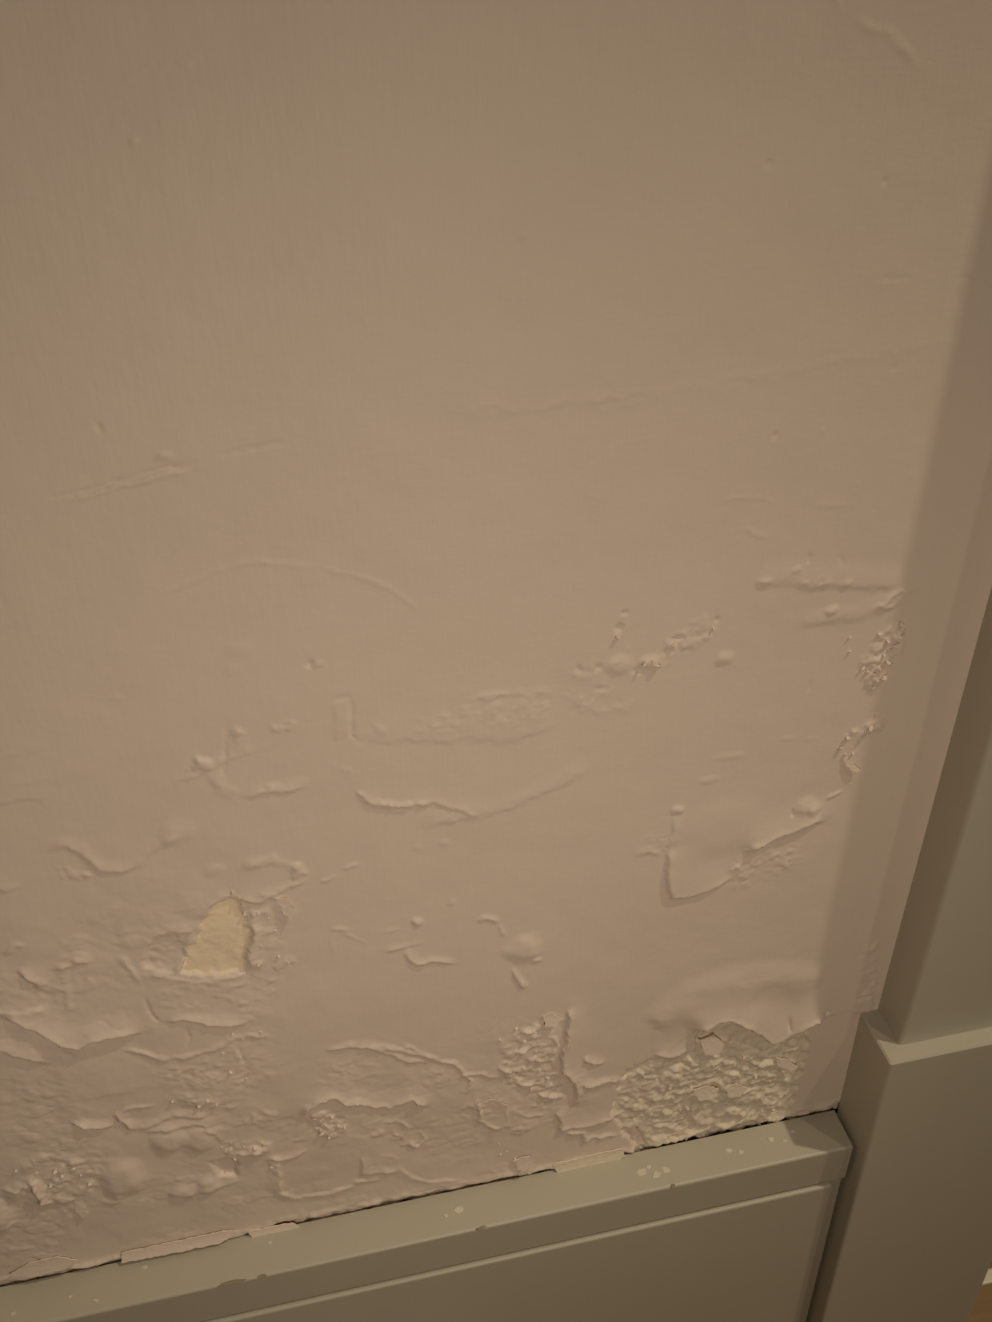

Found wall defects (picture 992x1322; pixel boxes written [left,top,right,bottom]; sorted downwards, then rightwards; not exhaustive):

peeling [0,939,142,1063]
spalling [138,885,299,1013]
spalling [70,1012,571,1176]
spalling [611,992,830,1148]
spalling [0,1143,103,1219]